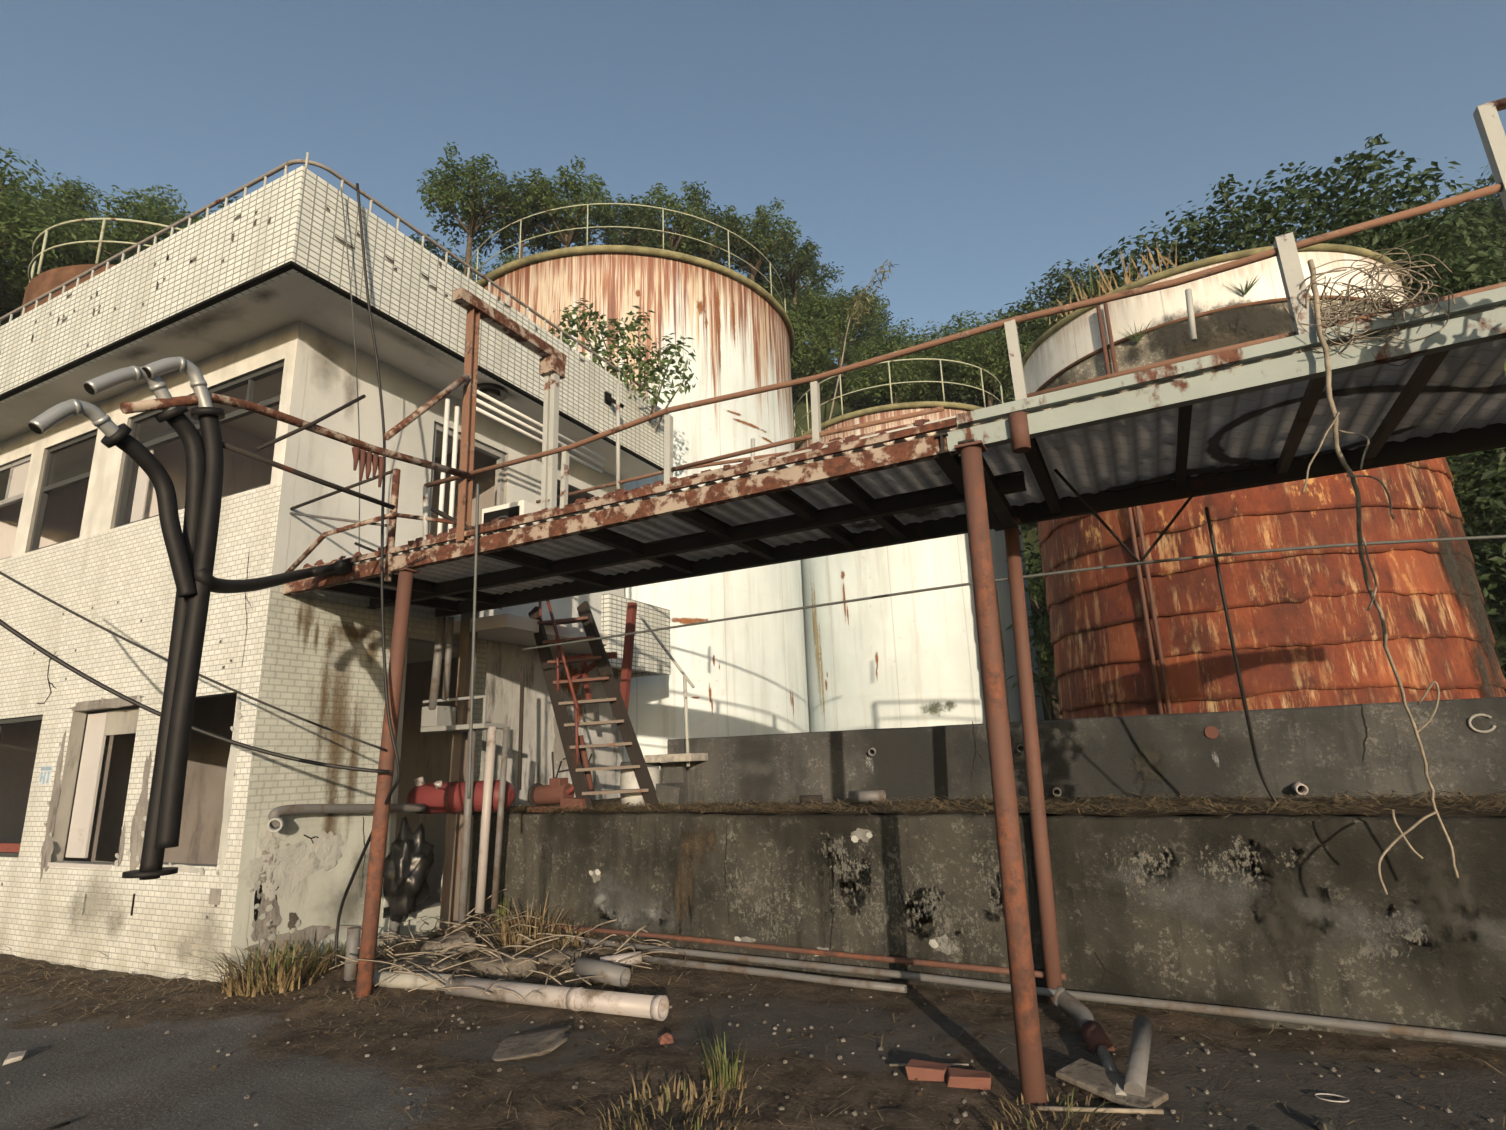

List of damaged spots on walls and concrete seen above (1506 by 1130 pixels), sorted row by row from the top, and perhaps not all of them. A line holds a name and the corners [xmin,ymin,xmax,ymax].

rust [697,280,735,369]
rust [727,410,772,443]
rust [812,591,828,711]
spalling [39,696,145,882]
peeling [163,677,344,963]
peeling [711,855,829,956]
peeling [813,828,1005,959]